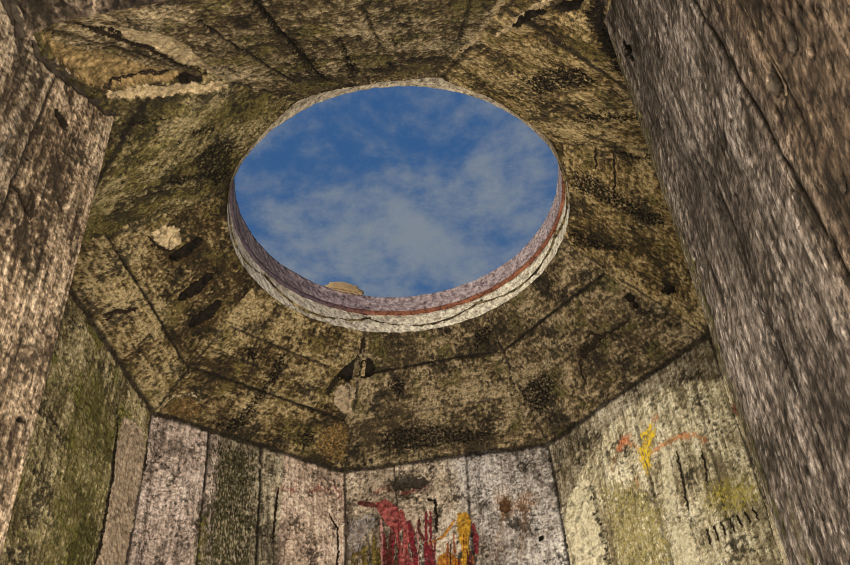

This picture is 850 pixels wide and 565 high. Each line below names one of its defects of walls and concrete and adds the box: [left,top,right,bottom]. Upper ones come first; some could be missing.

peeling [455,0,505,55]
peeling [494,0,620,71]
spalling [326,337,375,413]
leakage [35,359,118,565]
leakage [138,345,289,565]
peeling [659,444,702,565]